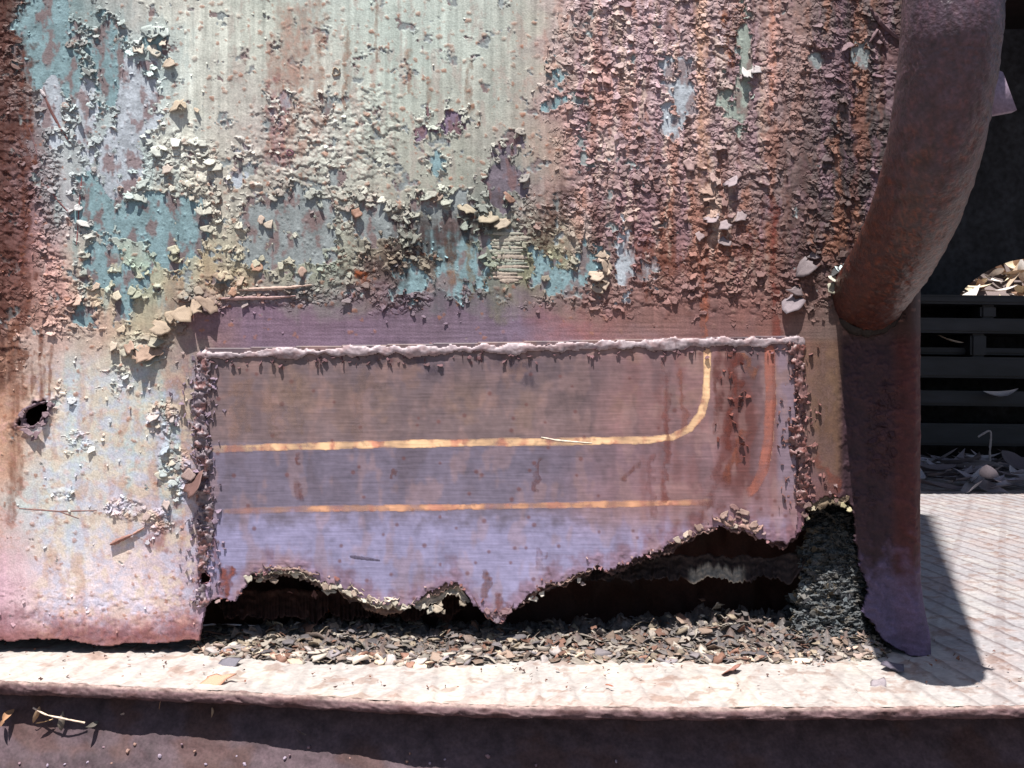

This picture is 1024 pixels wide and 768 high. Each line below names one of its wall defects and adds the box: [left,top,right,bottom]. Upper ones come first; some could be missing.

peeling [2,0,901,545]
peeling [243,567,445,615]
peeling [484,607,512,624]